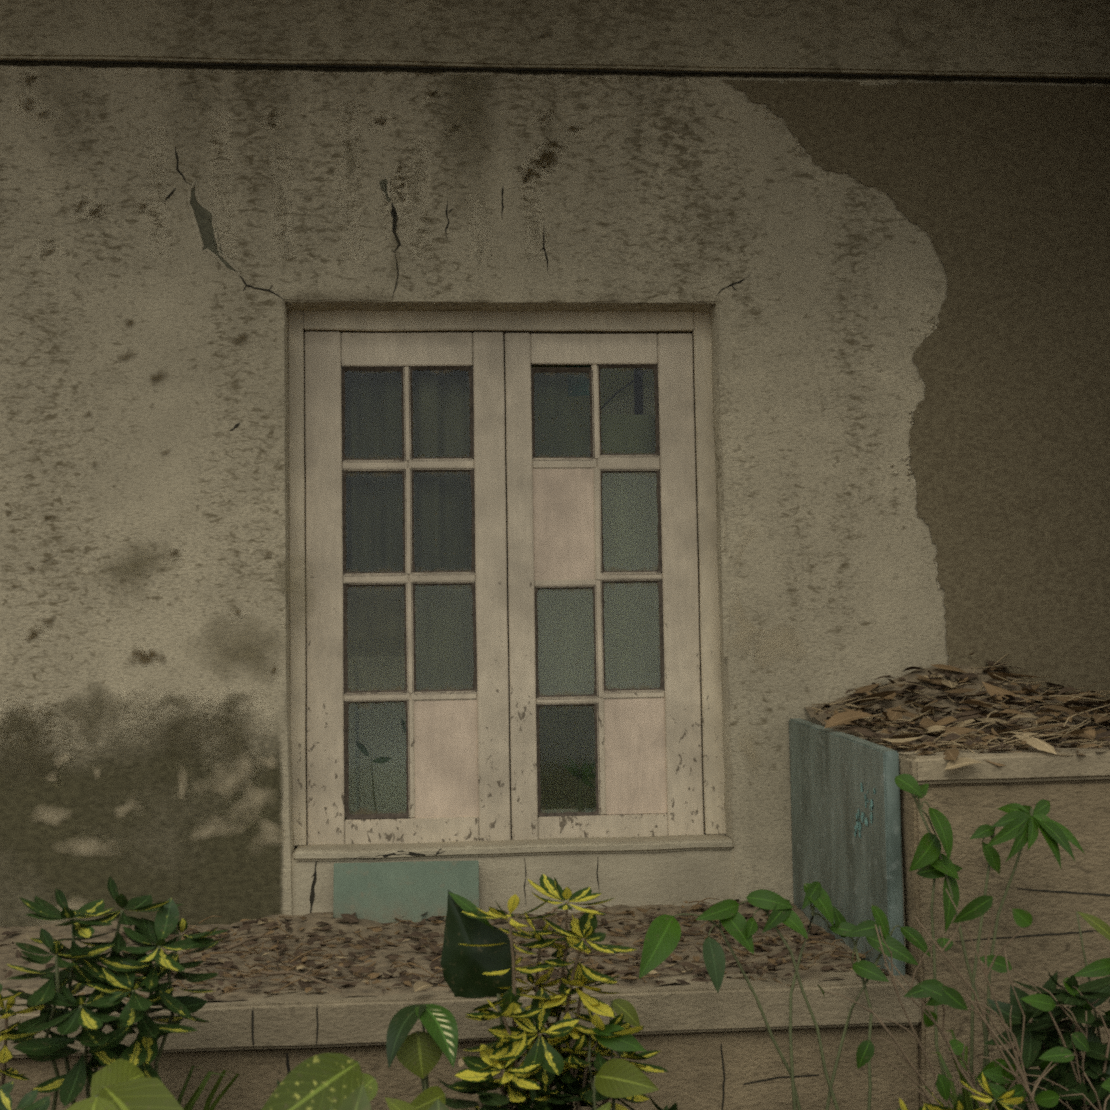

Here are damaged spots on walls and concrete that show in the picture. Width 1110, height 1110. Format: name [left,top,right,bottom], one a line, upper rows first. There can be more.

crack [165,148,191,200]
crack [391,202,402,298]
crack [240,276,283,299]